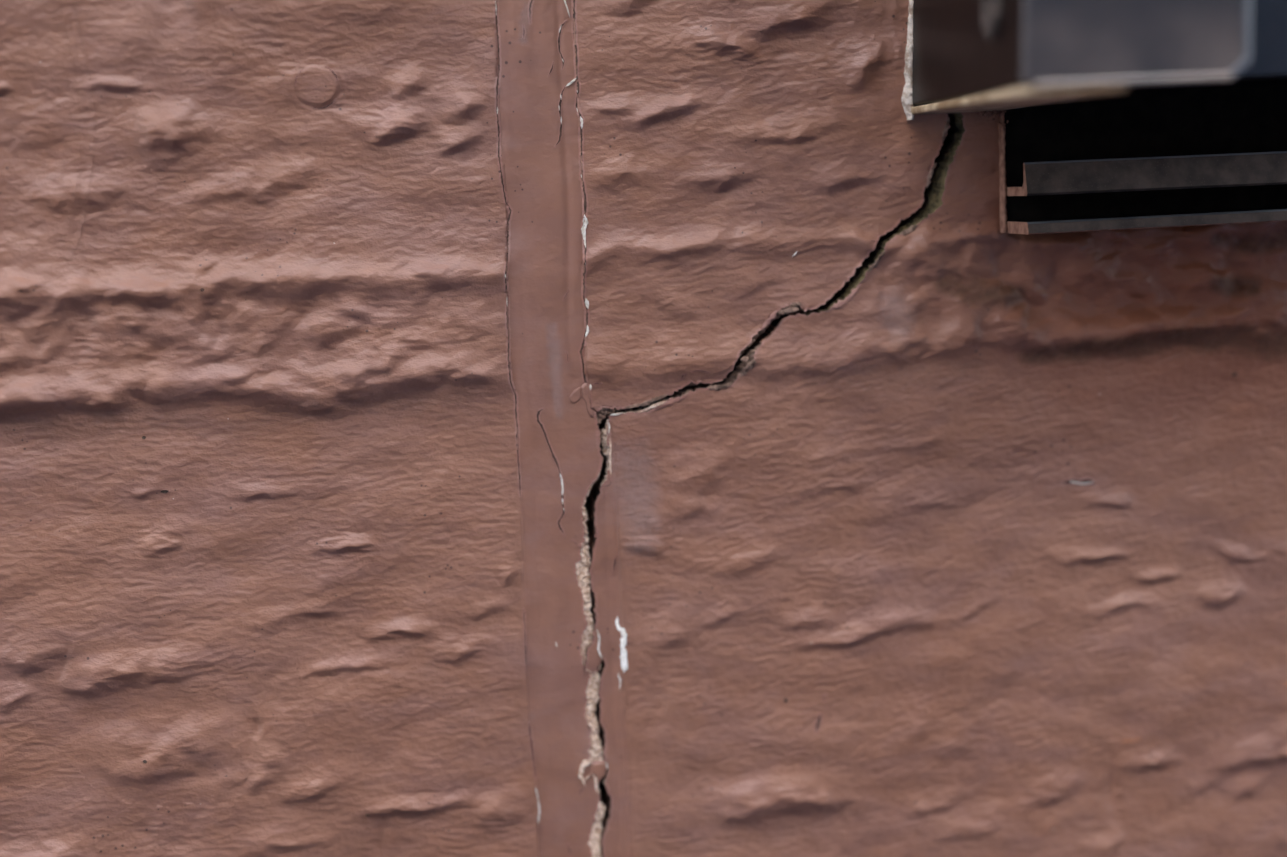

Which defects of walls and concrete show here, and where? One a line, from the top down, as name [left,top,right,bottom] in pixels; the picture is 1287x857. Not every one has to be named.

peeling [615,616,628,690]
crack [493,0,968,857]